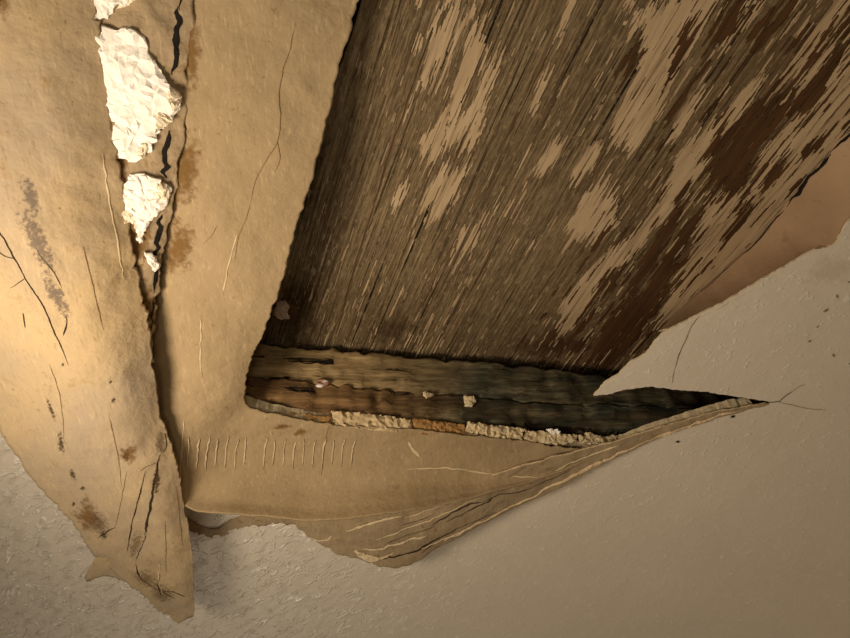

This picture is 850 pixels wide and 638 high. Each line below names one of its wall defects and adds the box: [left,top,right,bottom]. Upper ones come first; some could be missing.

crack [171,0,183,75]
damp [185,29,201,76]
crack [160,131,172,178]
damp [174,149,200,203]
peeling [384,0,850,378]
flaking render [0,0,195,624]
crack [150,214,163,331]
peeling [272,300,299,342]
peeling [304,217,387,352]
flaking render [463,395,476,407]
flaking render [187,402,769,568]